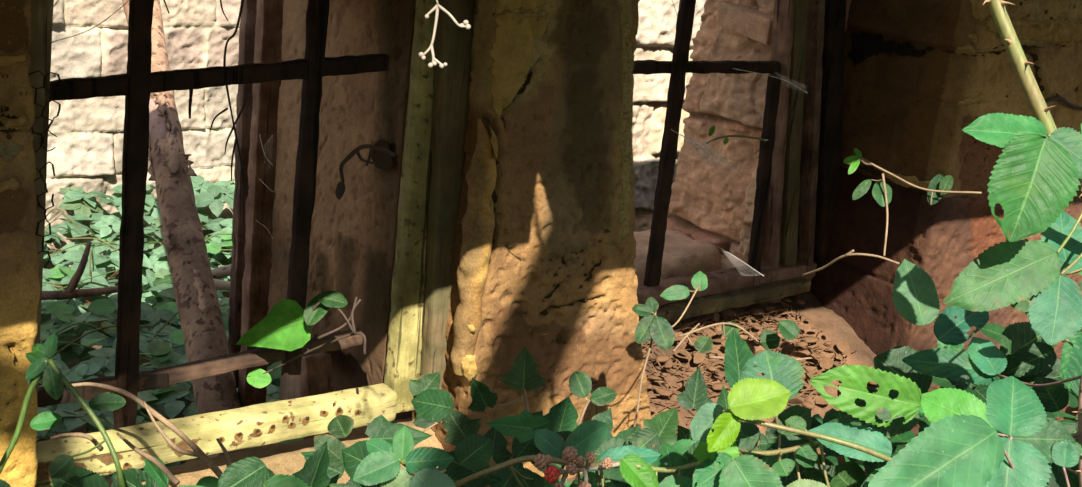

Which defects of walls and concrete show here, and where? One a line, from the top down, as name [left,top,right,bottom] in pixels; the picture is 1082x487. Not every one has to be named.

crack [941,44,1066,92]
crack [0,106,20,134]
crack [483,60,538,264]
crack [540,297,595,316]